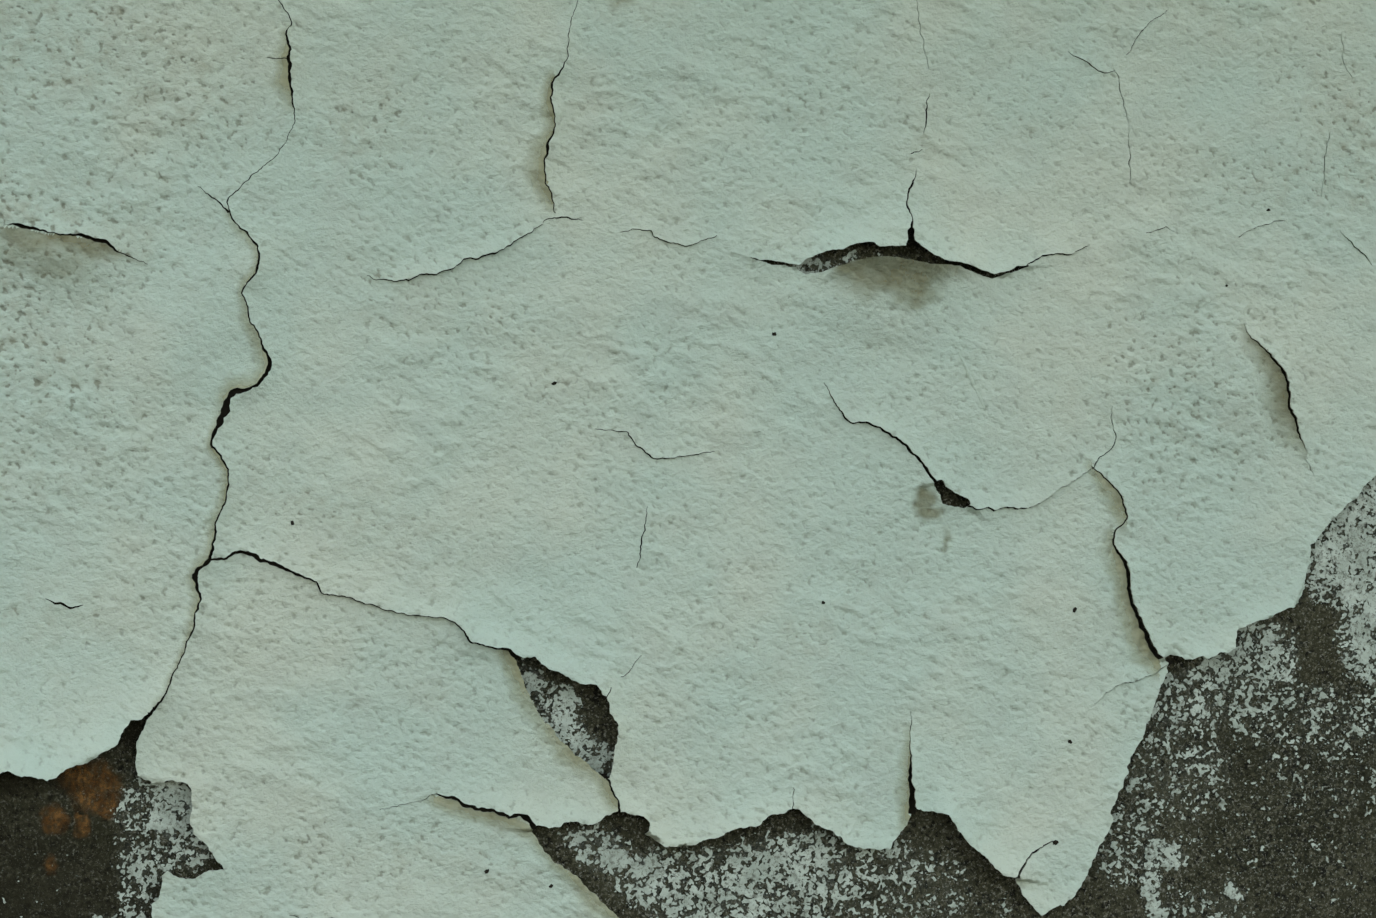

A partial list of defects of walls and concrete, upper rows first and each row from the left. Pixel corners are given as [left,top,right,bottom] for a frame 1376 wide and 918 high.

crack [7,223,146,264]
crack [367,0,580,282]
crack [755,97,1087,279]
crack [148,0,520,717]
crack [824,383,937,485]
peeling [1246,325,1321,448]
crack [965,411,1173,693]
spalling [201,386,1376,918]
rust [43,764,118,836]
spalling [0,636,241,918]
crack [387,793,538,832]
crack [908,719,916,814]